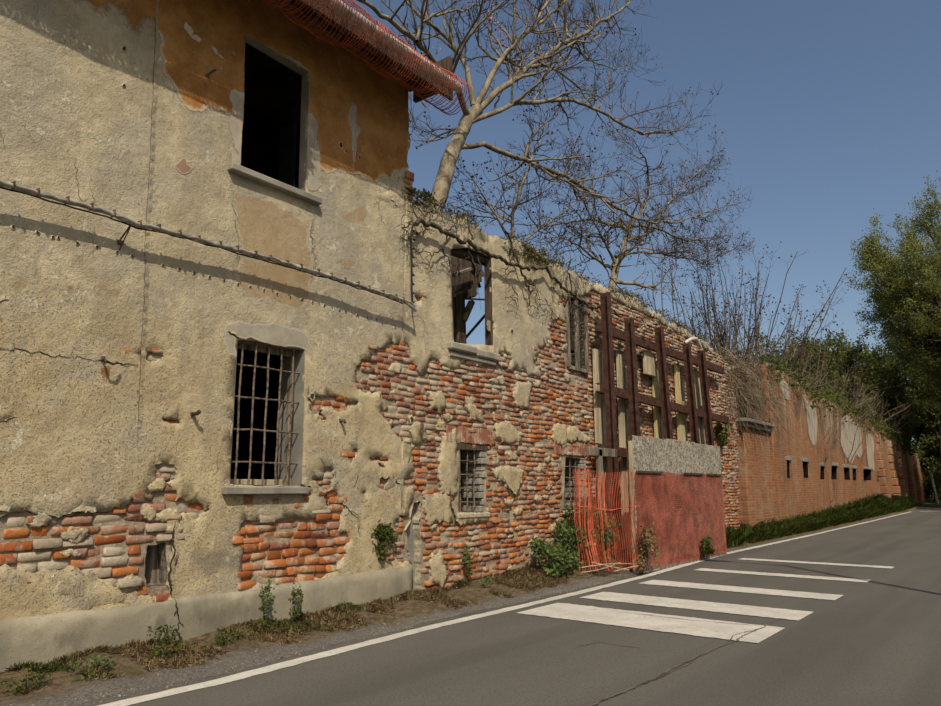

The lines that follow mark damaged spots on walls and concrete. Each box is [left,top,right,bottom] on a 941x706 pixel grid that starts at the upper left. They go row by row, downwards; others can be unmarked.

peeling [88,0,414,201]
crack [0,0,160,462]
spalling [0,463,208,602]
crack [167,521,183,642]
spalling [232,467,355,590]
spalling [308,290,740,590]